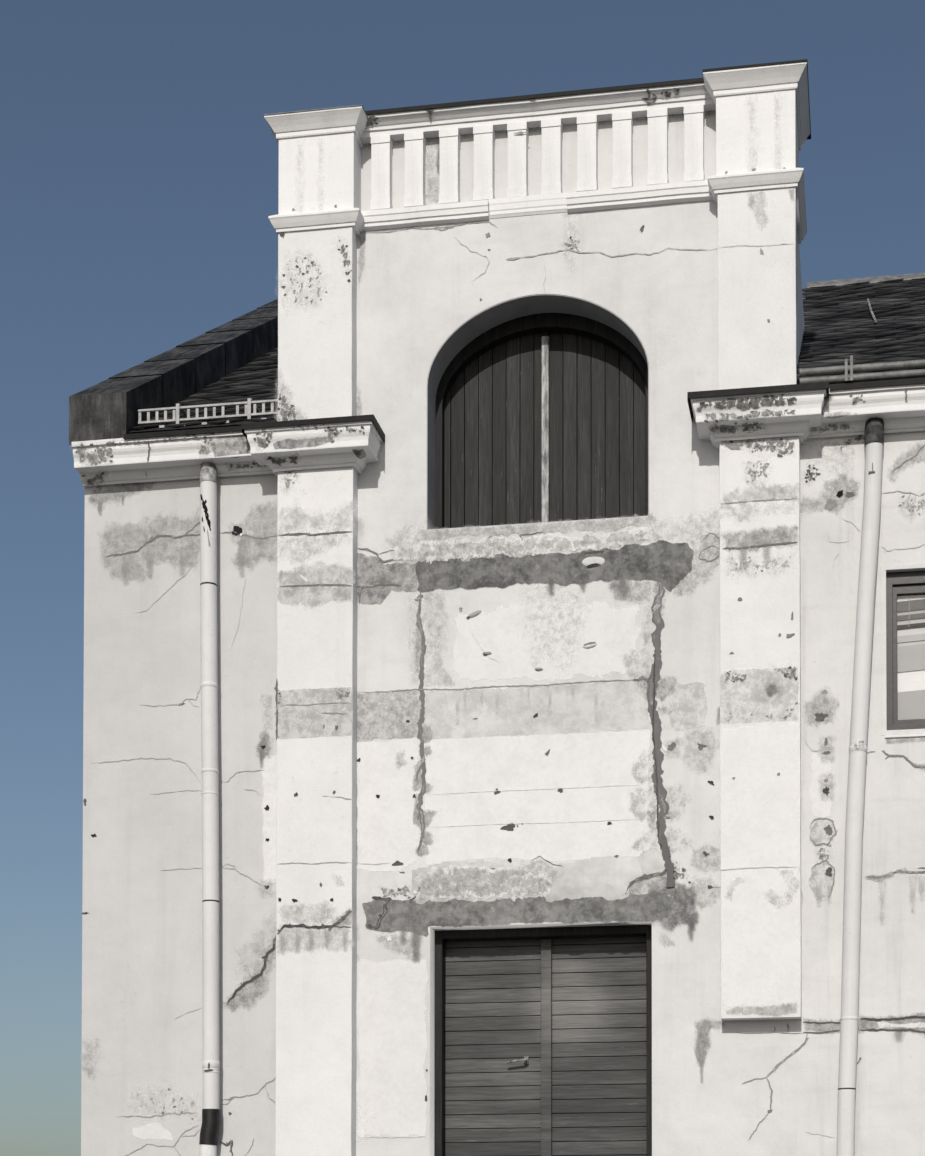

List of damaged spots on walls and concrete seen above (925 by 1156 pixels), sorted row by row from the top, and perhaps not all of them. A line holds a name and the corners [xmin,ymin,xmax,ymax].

crack [366,221,792,291]
peeling [697,394,797,482]
peeling [357,540,693,604]
flaking render [277,687,421,742]
crack [95,522,802,1019]
crack [867,750,925,768]
peeling [362,861,669,961]
flaking render [808,818,838,906]
crack [865,867,925,924]
crack [737,1023,808,1139]